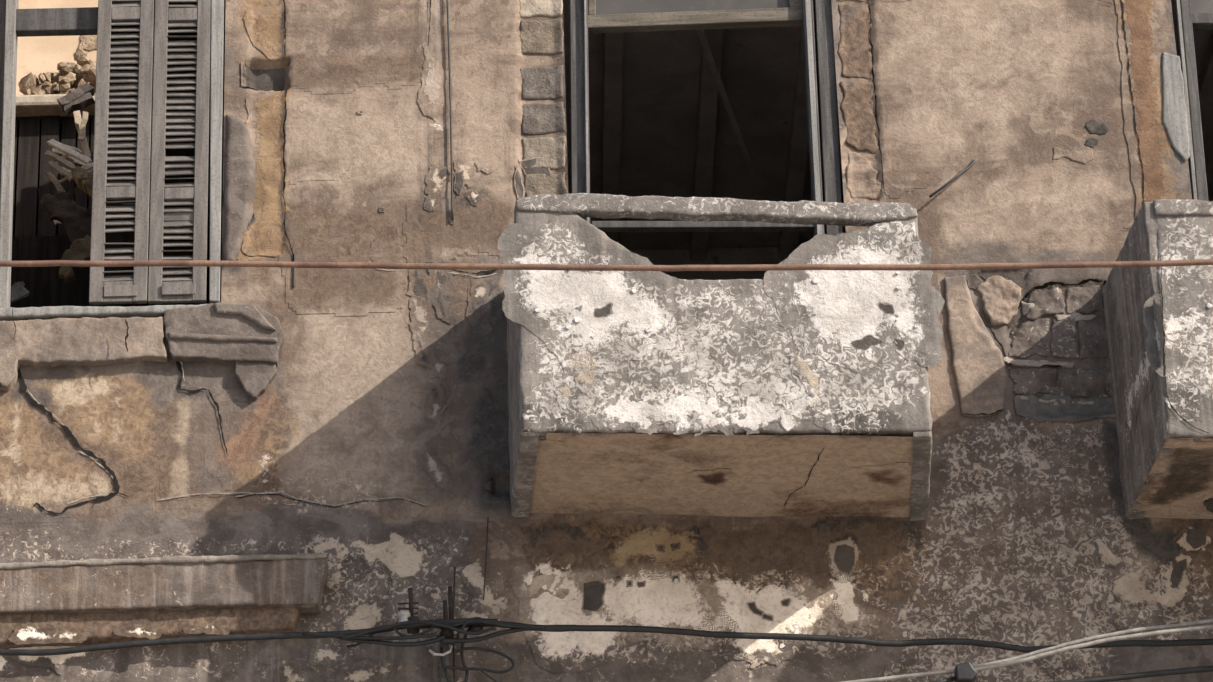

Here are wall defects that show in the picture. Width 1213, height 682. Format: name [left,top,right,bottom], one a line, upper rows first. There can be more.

flaking render [514,0,568,198]
crack [868,0,885,193]
crack [1098,0,1144,203]
peeling [1115,0,1178,216]
crack [0,308,427,515]
peeling [297,528,439,589]
water stain [463,312,630,567]
peeling [456,517,880,674]
peeling [403,222,945,436]
crack [784,448,824,506]
flaking render [964,269,1213,452]
water stain [1091,418,1213,590]